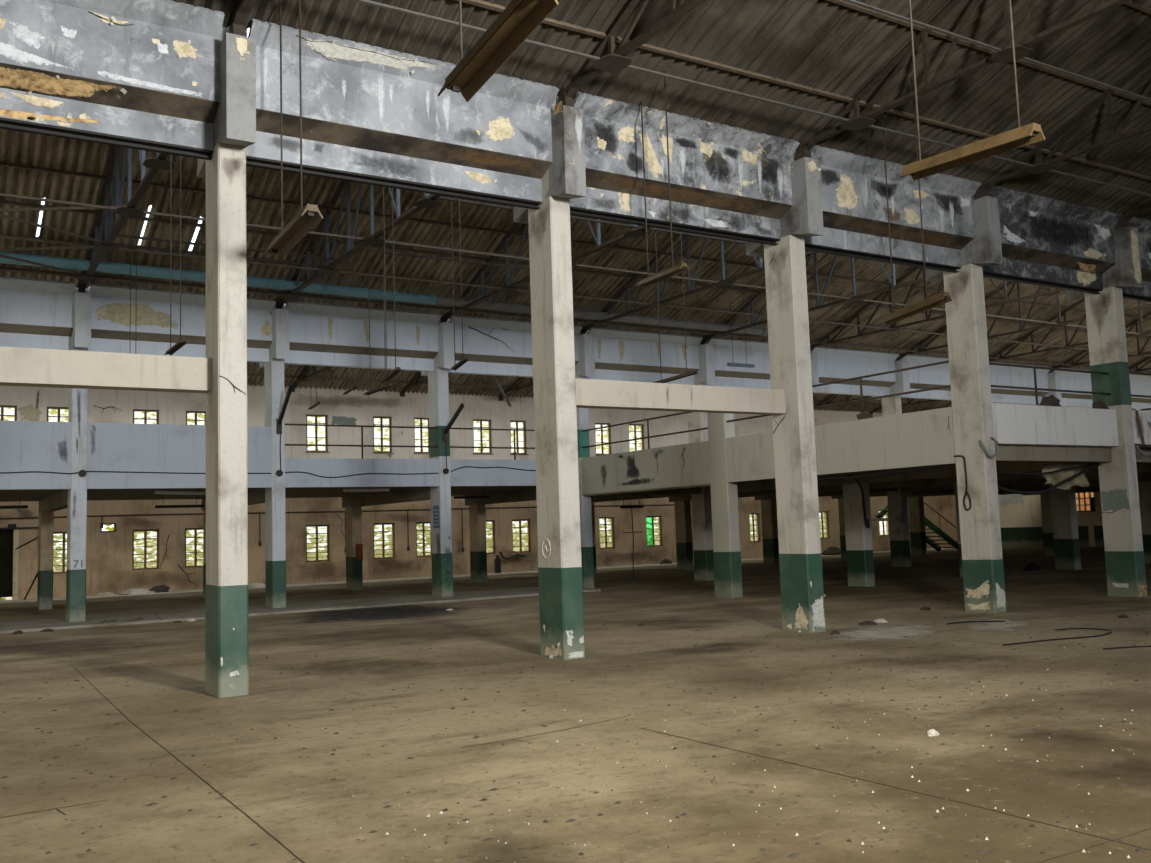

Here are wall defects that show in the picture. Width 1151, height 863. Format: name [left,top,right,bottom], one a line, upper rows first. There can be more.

spalling [0,67,127,127]
water stain [576,120,617,153]
peeling [597,124,673,175]
water stain [627,154,643,173]
water stain [677,139,742,186]
water stain [758,157,783,191]
water stain [705,218,738,228]
spalling [1077,247,1106,286]
water stain [618,455,650,485]
peeling [787,581,826,632]
peeling [966,580,1006,610]
peeling [544,630,584,659]